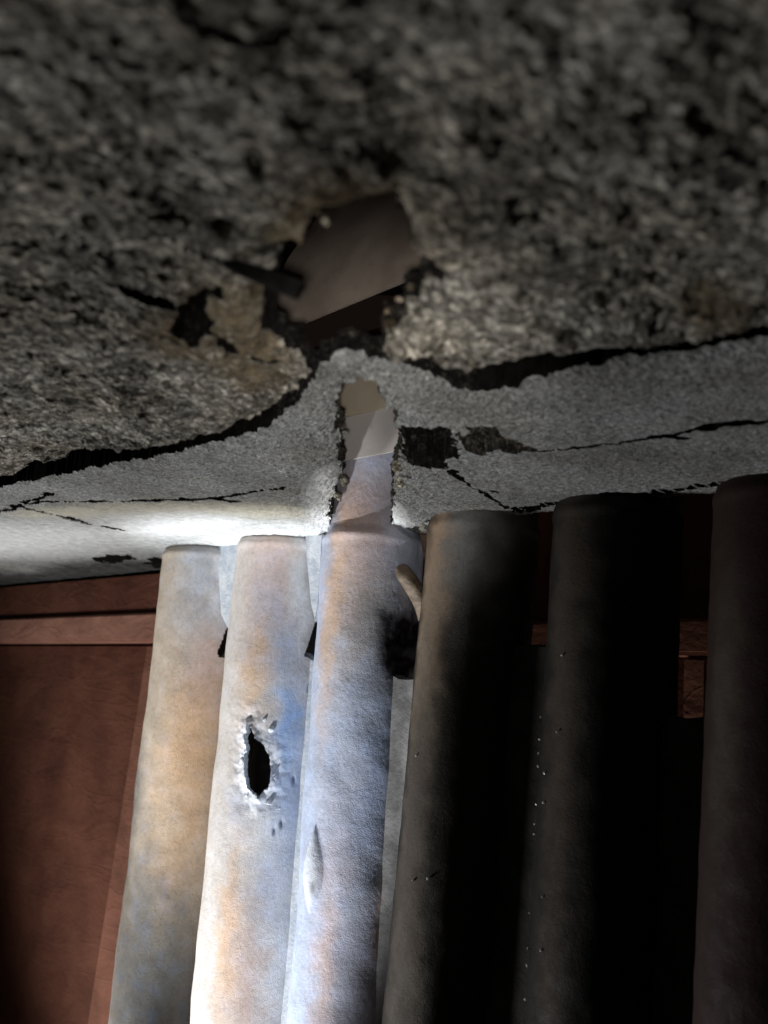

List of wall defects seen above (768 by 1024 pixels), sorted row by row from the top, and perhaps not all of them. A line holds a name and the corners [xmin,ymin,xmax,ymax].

hole [169,285,216,349]
crack [478,324,768,392]
crack [0,405,286,529]
spalling [398,425,538,469]
crack [446,469,557,513]
crack [535,419,768,452]
crack [641,481,721,496]